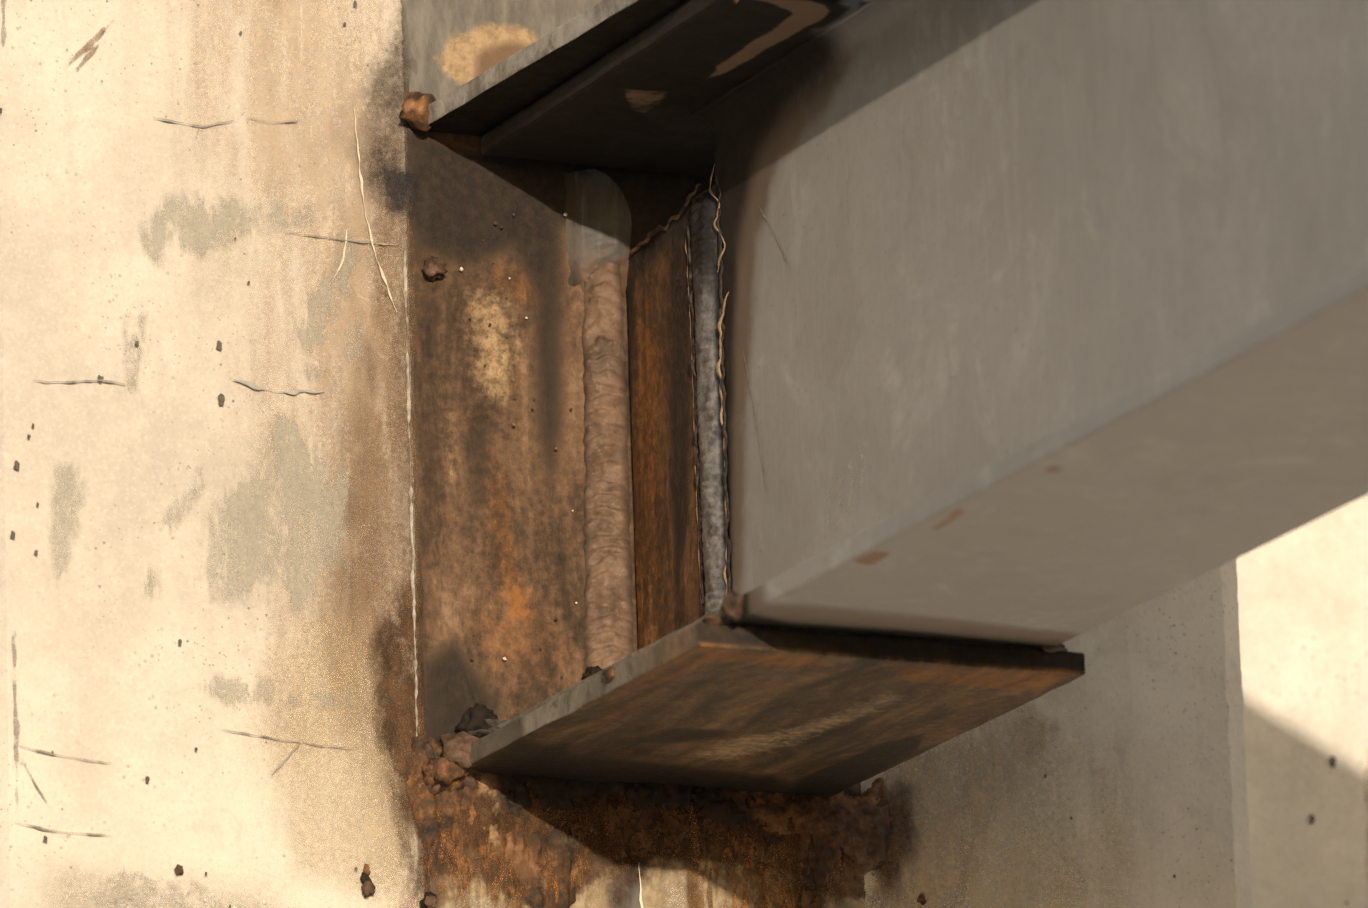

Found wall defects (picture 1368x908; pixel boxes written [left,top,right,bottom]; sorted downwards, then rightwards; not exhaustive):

damp [226,0,398,715]
corrosion [334,284,892,908]